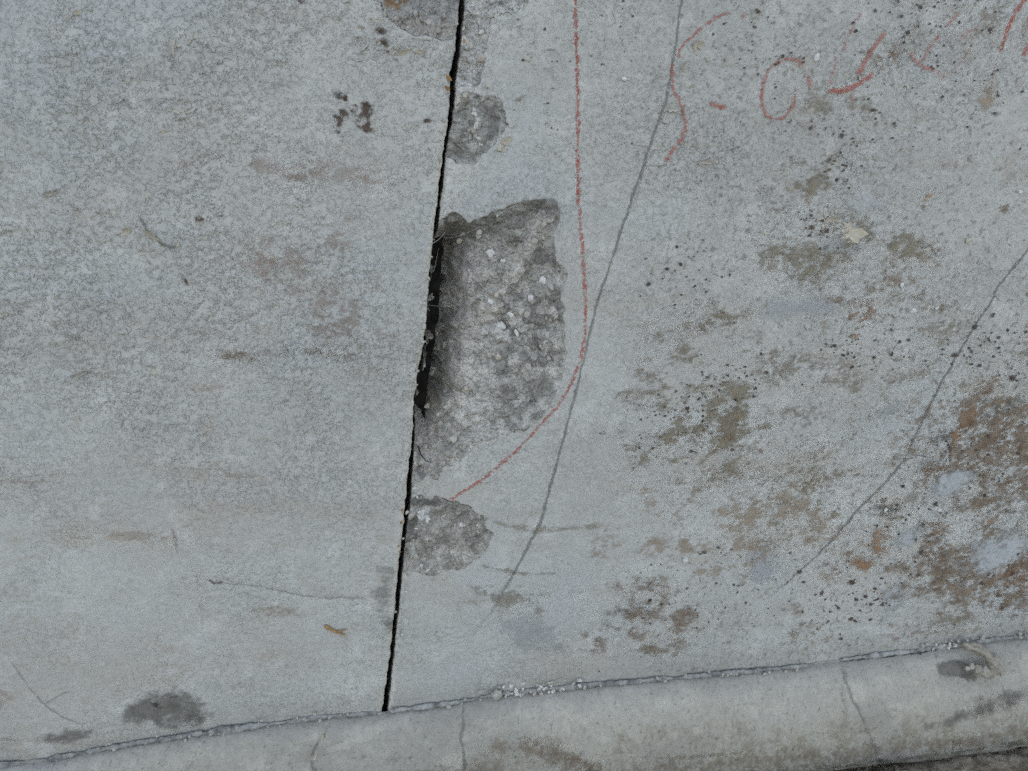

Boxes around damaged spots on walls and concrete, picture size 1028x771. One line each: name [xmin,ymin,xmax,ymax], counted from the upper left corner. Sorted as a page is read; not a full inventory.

crack [436,0,466,185]
crack [382,237,443,712]
spalling [403,198,567,581]
crack [508,0,683,583]
rust [953,404,977,445]
leakage [124,693,206,728]